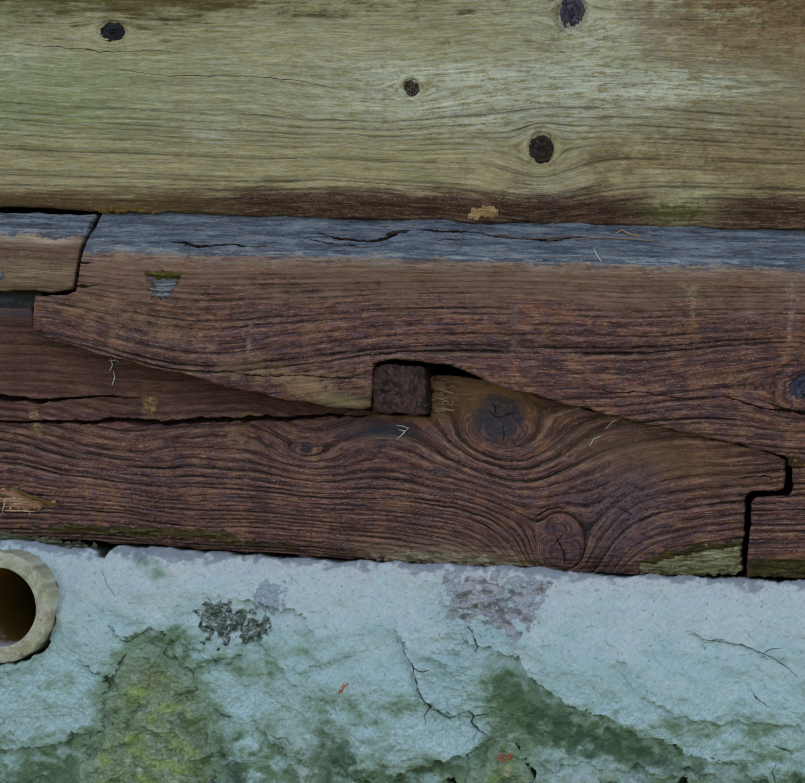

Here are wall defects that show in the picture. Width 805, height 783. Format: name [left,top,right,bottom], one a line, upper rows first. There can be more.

crack [173,240,265,248]
crack [287,230,586,248]
crack [0,394,369,425]
crack [689,634,798,678]
crack [400,640,492,735]
spalling [77,638,222,783]
spalling [425,737,537,783]